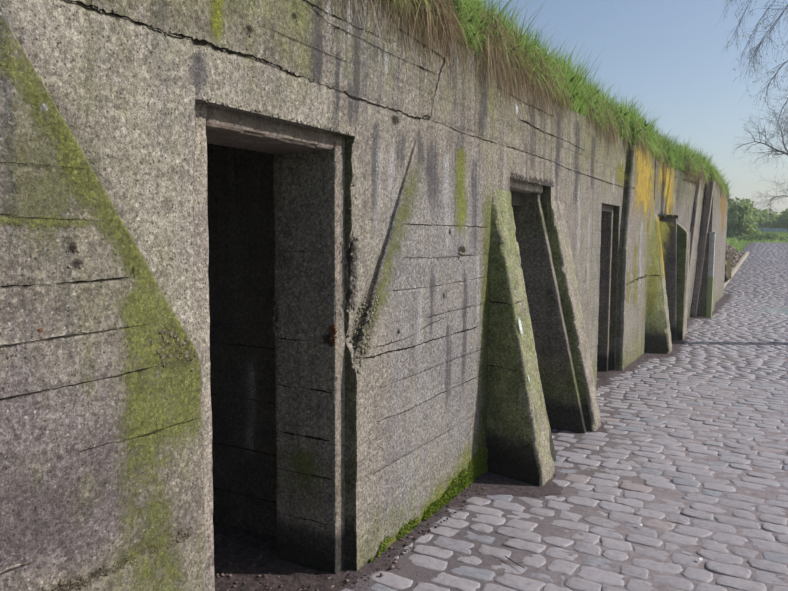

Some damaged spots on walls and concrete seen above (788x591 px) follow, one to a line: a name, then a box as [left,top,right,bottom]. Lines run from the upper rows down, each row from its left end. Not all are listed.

crack [60,0,635,189]
leakage [455,149,466,230]
crack [0,277,129,287]
rust [322,324,337,346]
crack [360,295,521,360]
crack [0,366,154,400]
crack [381,350,517,421]